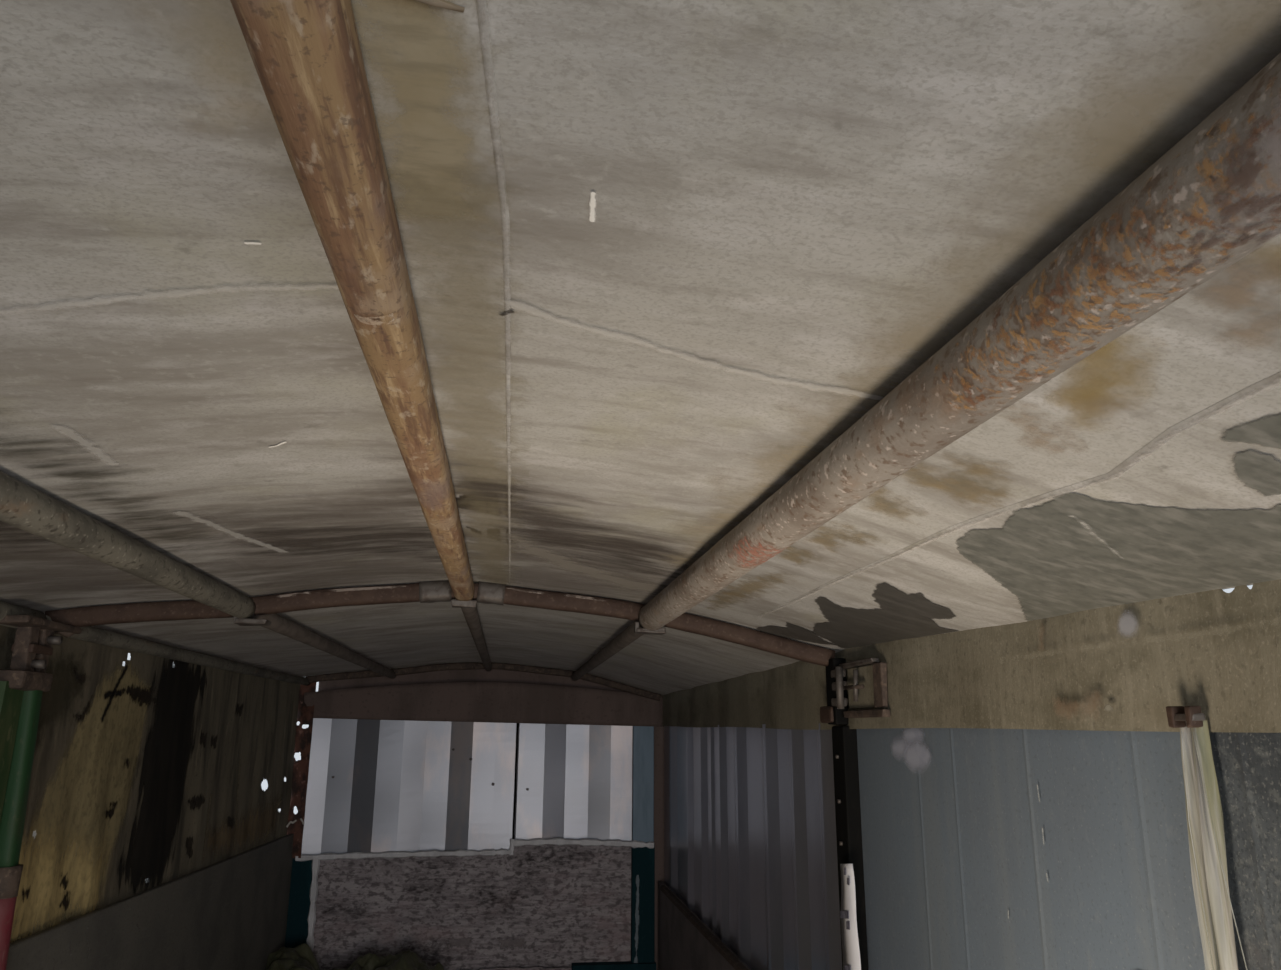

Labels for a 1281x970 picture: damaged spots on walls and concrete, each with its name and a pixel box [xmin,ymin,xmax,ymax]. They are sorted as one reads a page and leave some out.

corrosion [898,94,1281,410]
corrosion [827,367,899,436]
corrosion [673,513,805,604]
damp [11,657,282,941]